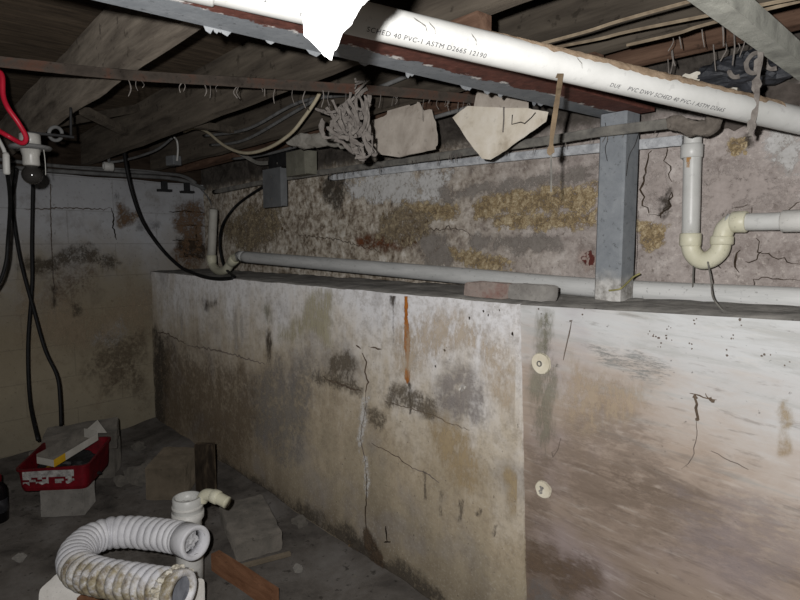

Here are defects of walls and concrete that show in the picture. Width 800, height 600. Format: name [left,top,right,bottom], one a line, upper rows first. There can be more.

leakage [322,179,345,210]
crack [626,133,673,232]
leakage [24,184,115,306]
rust [578,250,596,270]
crack [717,238,795,285]
crack [157,332,264,364]
leakage [313,351,386,445]
crack [323,345,439,562]
leakage [387,371,483,419]
crack [683,393,748,470]